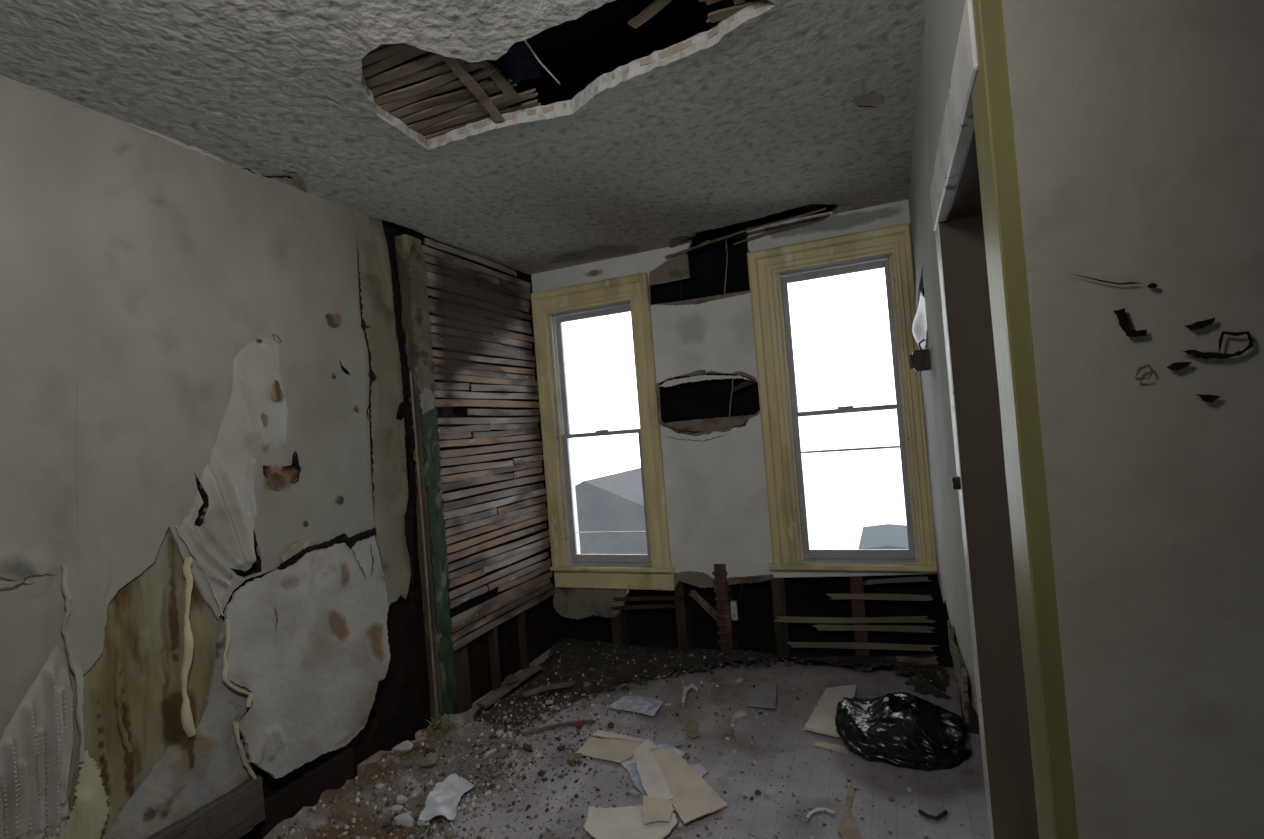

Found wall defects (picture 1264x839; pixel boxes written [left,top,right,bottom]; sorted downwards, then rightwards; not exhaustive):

flaking render [649,233,750,306]
peeling [1114,308,1147,337]
peeling [1135,317,1254,380]
peeling [271,379,284,402]
flaking render [657,370,760,436]
peeling [1195,394,1221,403]
flaking render [263,451,301,492]
flaking render [553,587,627,620]
flaking render [223,520,391,779]